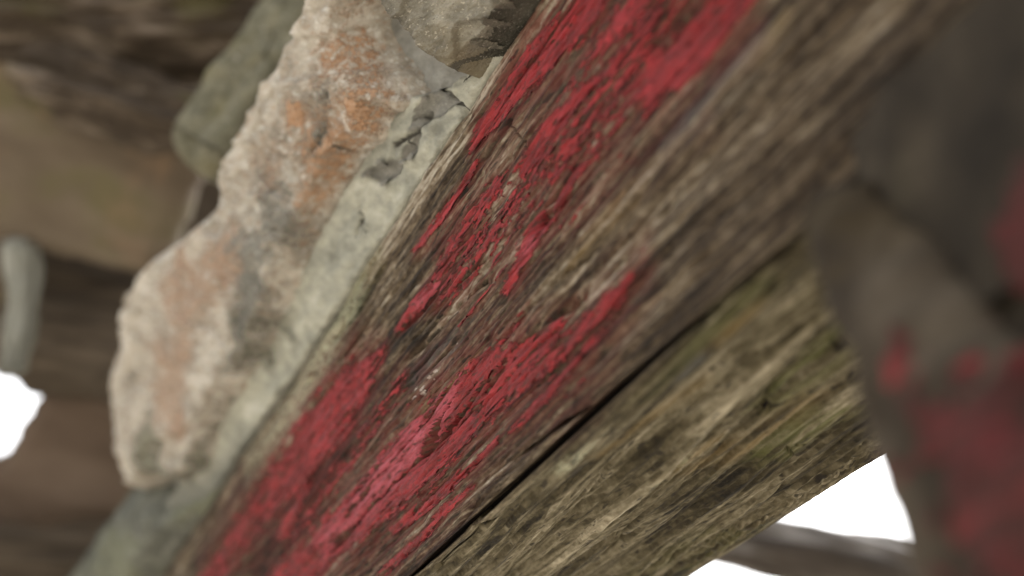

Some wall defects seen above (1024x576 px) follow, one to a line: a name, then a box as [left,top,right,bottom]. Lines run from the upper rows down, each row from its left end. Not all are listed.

peeling [360,0,755,332]
peeling [199,247,647,576]
crack [414,301,725,575]